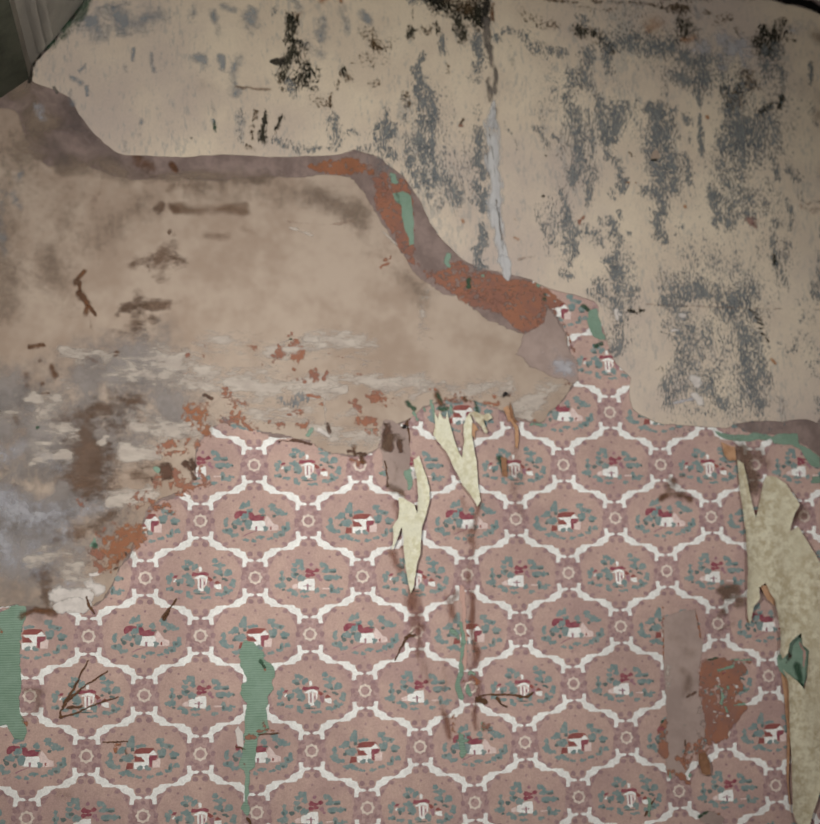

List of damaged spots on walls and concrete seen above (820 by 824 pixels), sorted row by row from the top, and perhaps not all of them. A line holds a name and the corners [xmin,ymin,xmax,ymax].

damp [237,6,391,154]
crack [481,0,511,281]
flaking render [0,80,571,353]
damp [406,0,820,435]
damp [202,332,500,445]
damp [0,339,197,618]
damp [128,438,211,515]
damp [736,444,760,492]
peeling [0,604,54,740]
peeling [235,640,275,816]
peeling [682,657,751,765]
peeling [777,634,809,687]